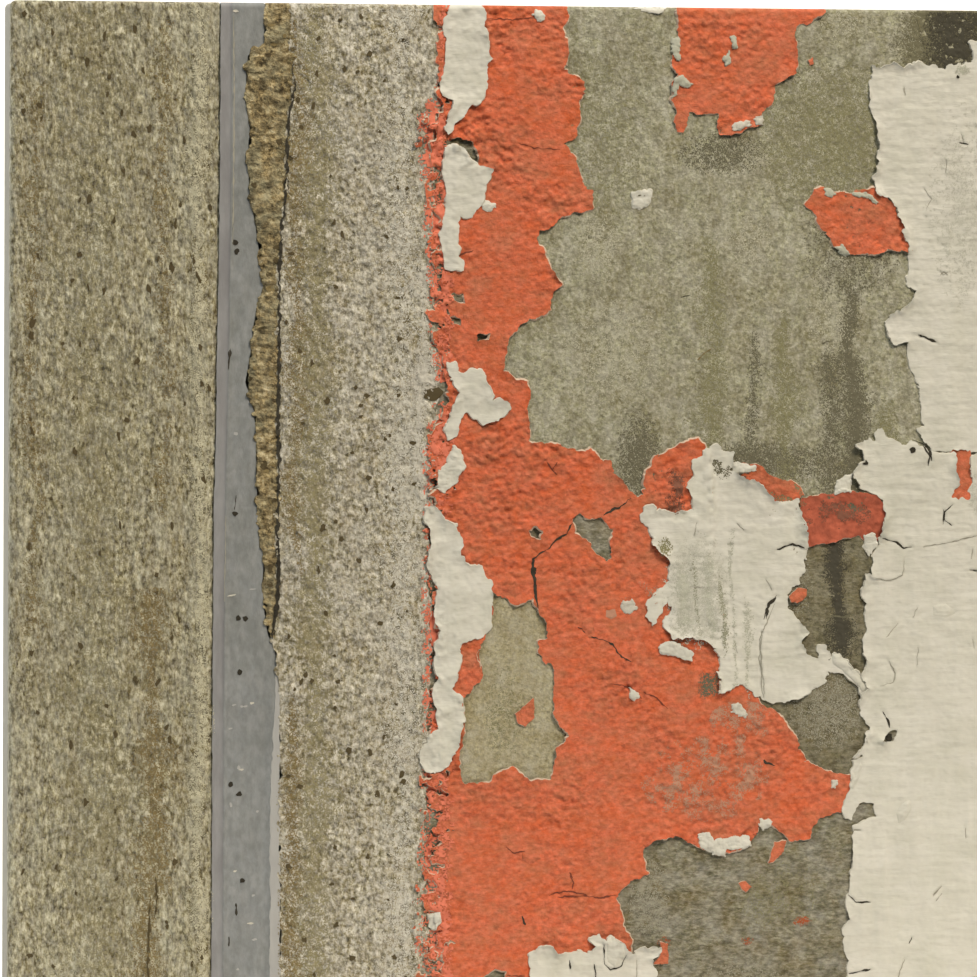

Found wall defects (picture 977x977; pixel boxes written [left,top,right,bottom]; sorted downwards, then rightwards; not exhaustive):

water stain [888,12,977,76]
crack [271,64,296,639]
peeling [504,6,977,498]
water stain [677,60,900,514]
crack [914,440,932,465]
crack [531,518,575,612]
water stain [789,528,863,661]
crack [875,505,977,581]
peeling [460,593,566,784]
water stain [785,673,866,753]
peeling [617,802,876,977]